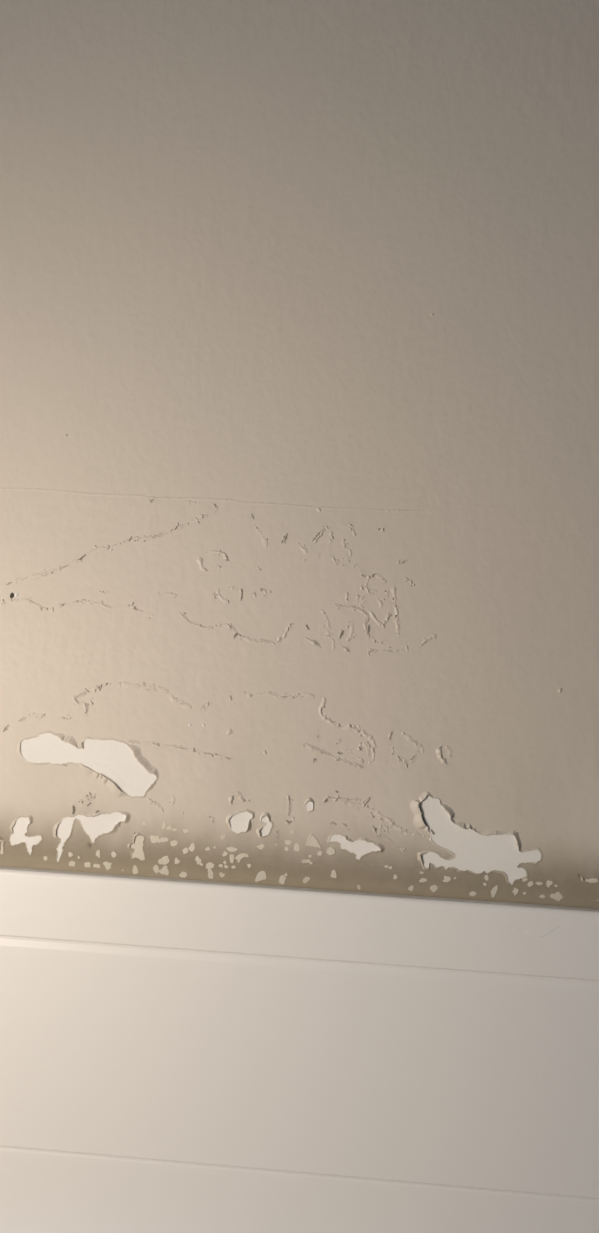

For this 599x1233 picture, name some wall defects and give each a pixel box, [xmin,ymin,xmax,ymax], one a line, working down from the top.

crack [0,503,436,656]
peeling [0,730,397,885]
crack [3,681,430,853]
peeling [408,791,563,901]